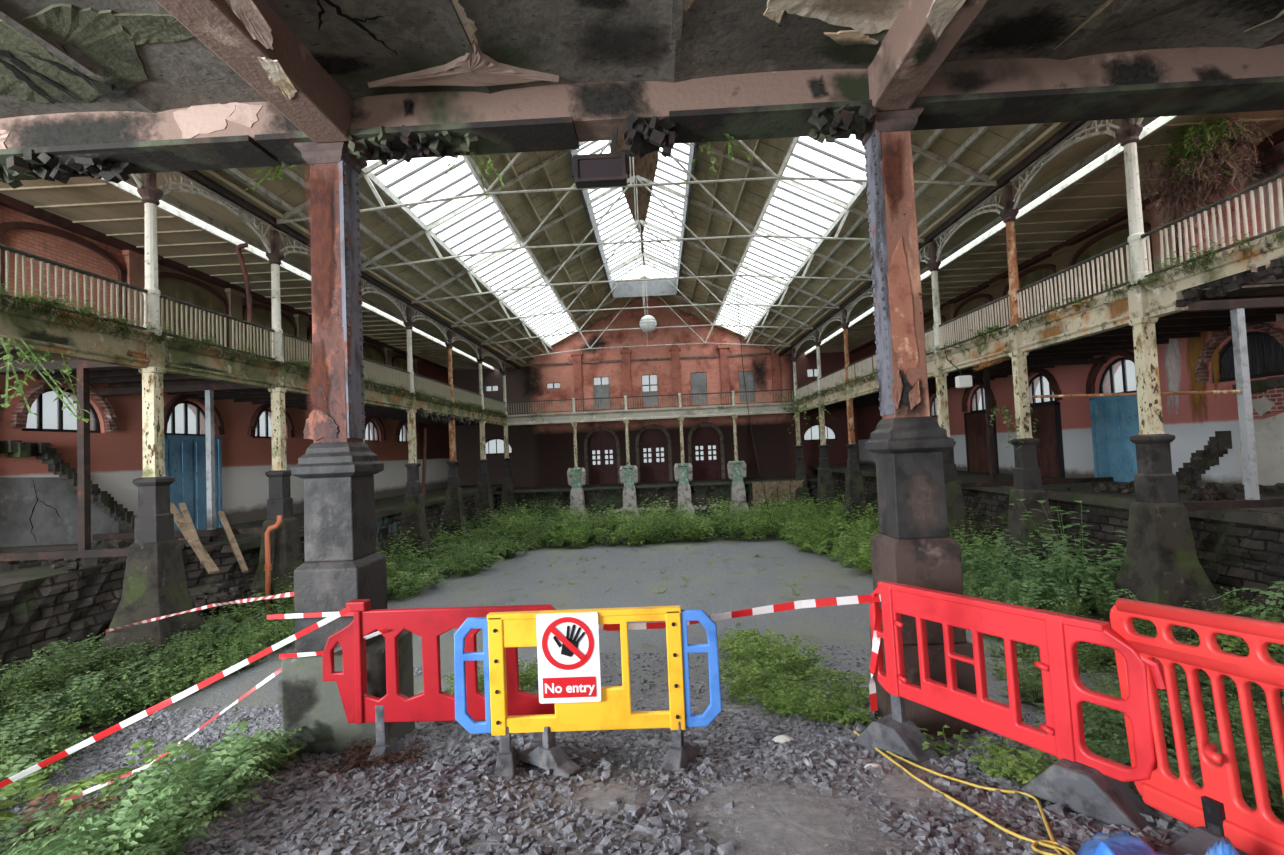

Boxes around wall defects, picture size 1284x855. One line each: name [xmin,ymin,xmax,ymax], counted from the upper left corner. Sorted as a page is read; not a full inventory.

flaking render [225,0,298,100]
crack [317,0,397,55]
flaking render [763,0,906,44]
damp [967,8,1068,52]
damp [951,70,989,91]
rust [882,138,902,214]
rust [306,175,333,320]
rust [309,344,330,414]
rust [891,369,924,414]
flaking render [1251,387,1284,417]